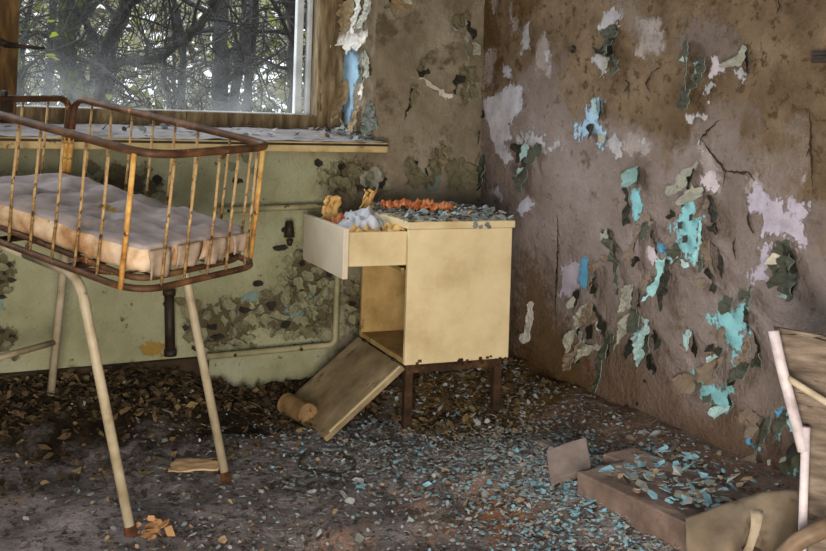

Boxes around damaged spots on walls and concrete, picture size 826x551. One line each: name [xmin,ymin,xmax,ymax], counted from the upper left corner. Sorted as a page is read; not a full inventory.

peeling [288,0,388,140]
peeling [591,6,623,79]
peeling [676,39,750,124]
peeling [87,159,166,203]
peeling [314,8,562,229]
peeling [574,97,623,162]
crack [699,120,755,187]
peeling [0,250,17,317]
peeling [0,326,20,362]
peeling [125,138,816,551]